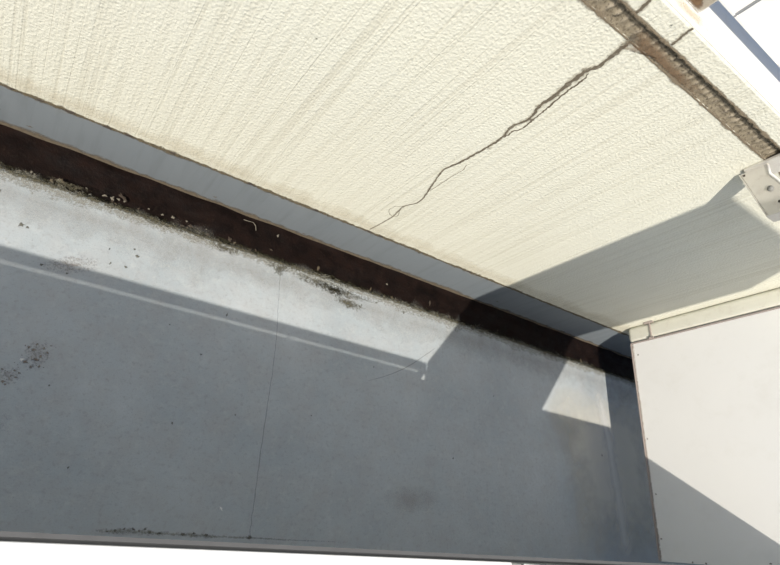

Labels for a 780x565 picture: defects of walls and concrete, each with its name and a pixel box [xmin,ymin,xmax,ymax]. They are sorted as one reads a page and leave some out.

crack [636,0,651,14]
crack [371,35,639,229]
leakage [0,121,632,359]